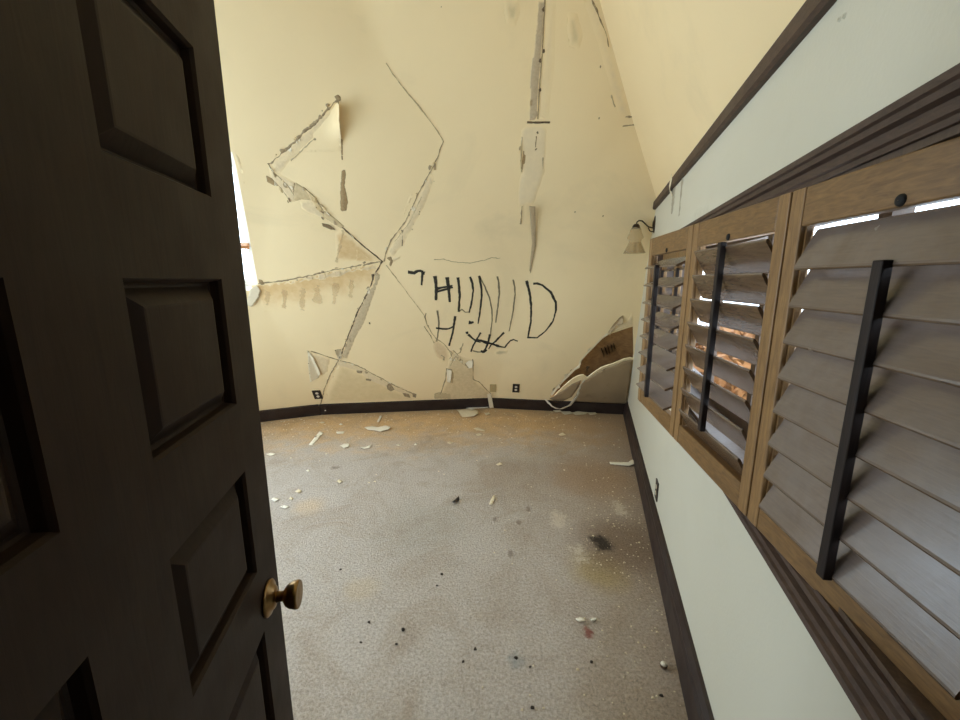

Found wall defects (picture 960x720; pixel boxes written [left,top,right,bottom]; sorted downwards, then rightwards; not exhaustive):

peeling [266,168,304,203]
peeling [340,170,348,211]
peeling [518,125,547,224]
crack [258,63,451,404]
peeling [344,362,416,398]
spalling [435,344,494,415]
spalling [544,314,633,415]